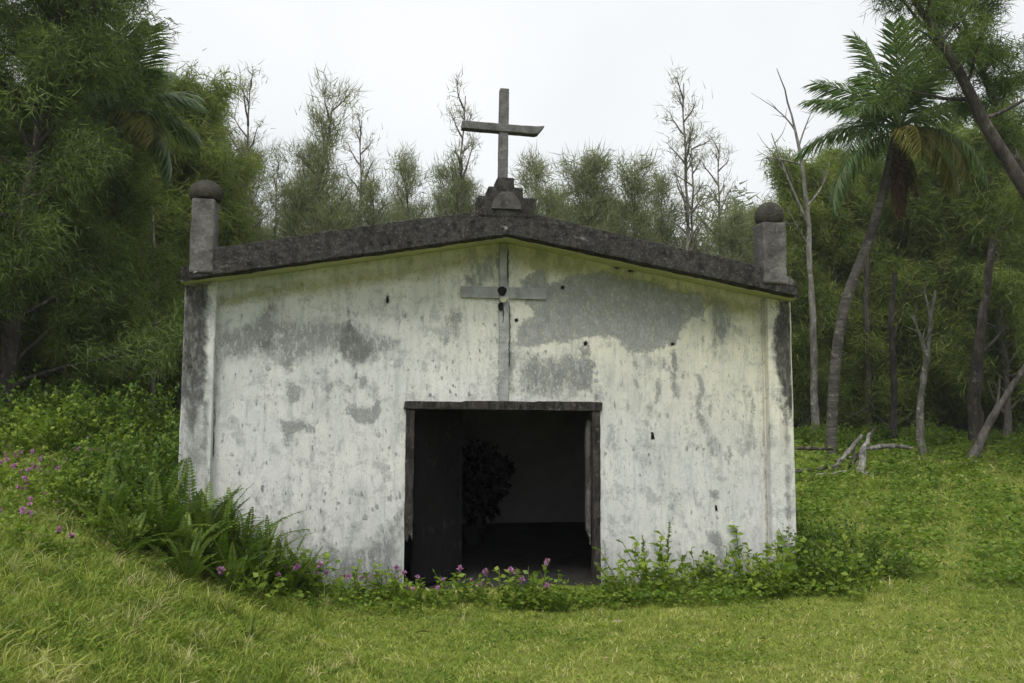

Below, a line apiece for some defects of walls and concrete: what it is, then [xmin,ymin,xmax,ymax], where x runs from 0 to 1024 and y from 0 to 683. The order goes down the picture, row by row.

water stain [181,284,209,464]
water stain [220,305,397,365]
water stain [509,355,593,393]
water stain [774,300,792,420]